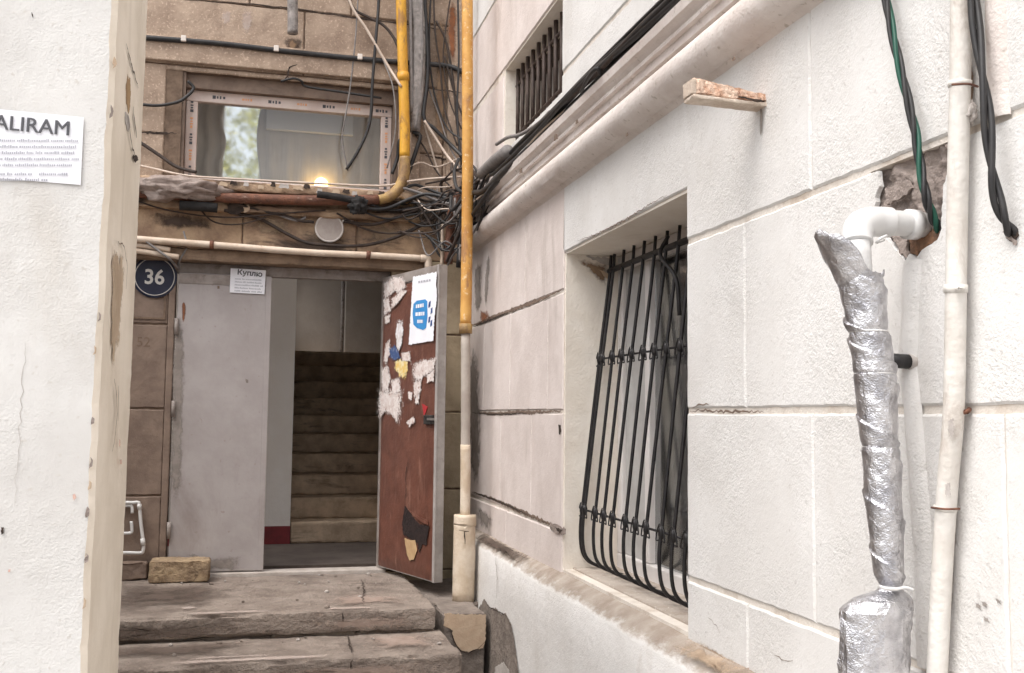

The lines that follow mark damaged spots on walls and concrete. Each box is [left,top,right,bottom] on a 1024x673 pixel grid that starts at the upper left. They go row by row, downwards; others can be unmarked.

spalling [879,143,948,258]
peeling [97,243,127,363]
crack [14,357,26,495]
crack [340,580,378,669]
spalling [479,599,519,673]